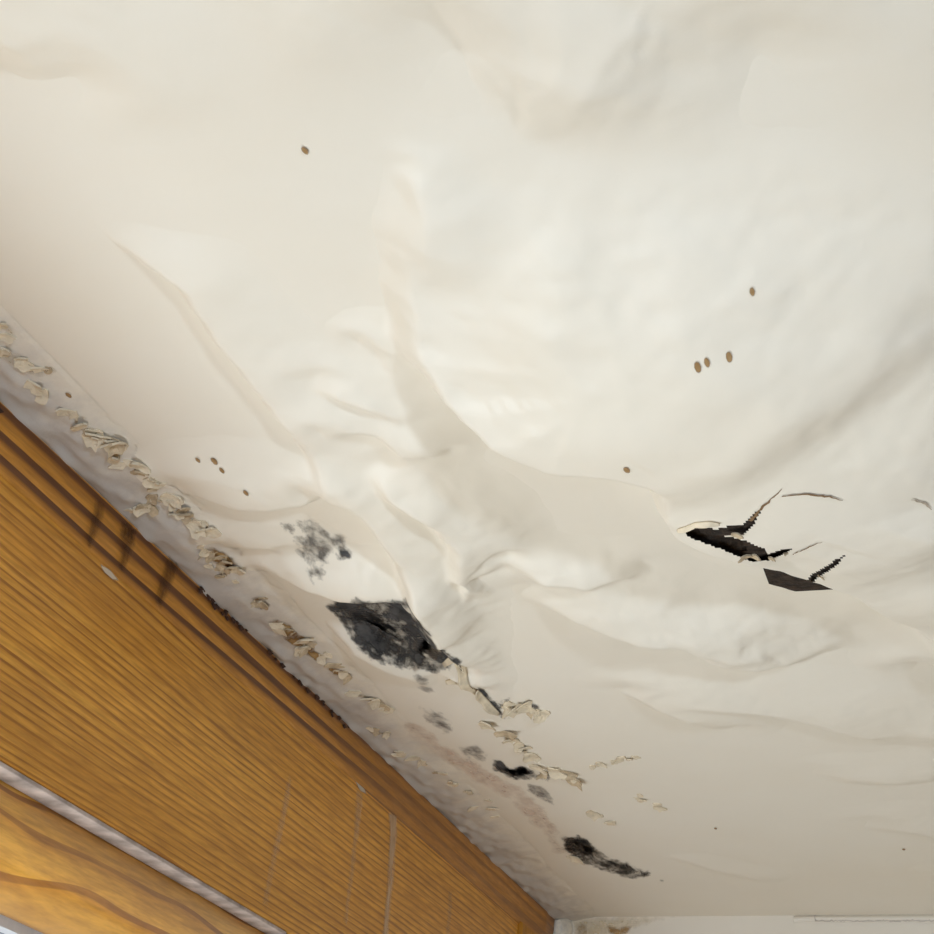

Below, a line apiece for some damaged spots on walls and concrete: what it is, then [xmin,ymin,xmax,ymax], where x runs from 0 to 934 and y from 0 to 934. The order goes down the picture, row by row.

damp [302,527,351,559]
peeling [250,597,269,610]
peeling [268,621,395,714]